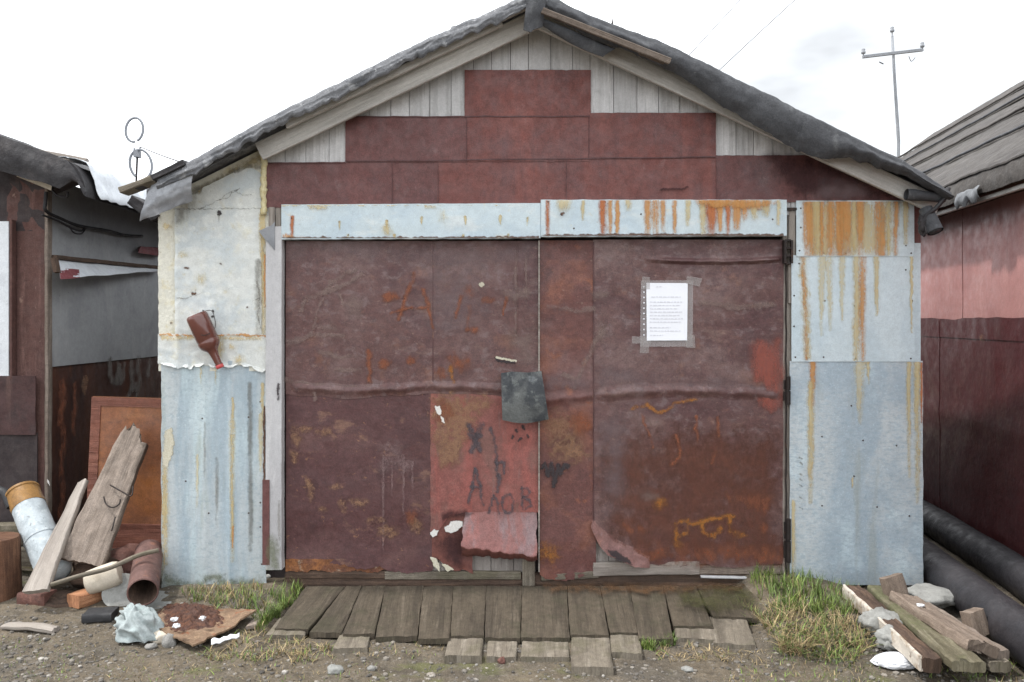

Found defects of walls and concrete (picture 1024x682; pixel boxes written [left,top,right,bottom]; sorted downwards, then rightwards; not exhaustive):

corrosion [282,200,784,238]
peeling [161,363,266,372]
corrosion [799,201,908,478]
corrosion [907,362,923,465]
peeling [407,511,467,572]
corrosion [673,514,746,544]